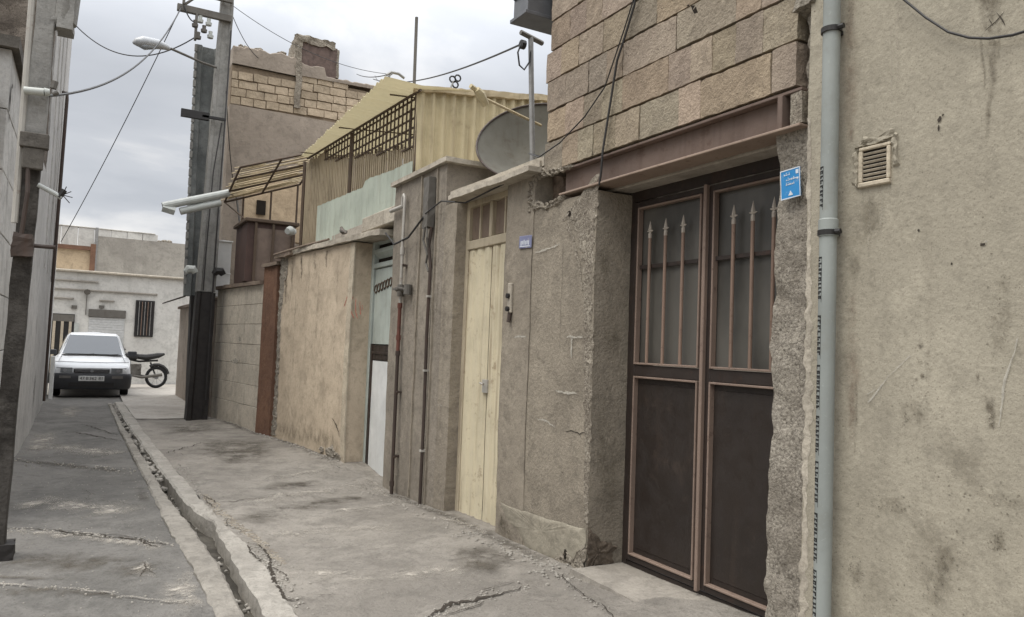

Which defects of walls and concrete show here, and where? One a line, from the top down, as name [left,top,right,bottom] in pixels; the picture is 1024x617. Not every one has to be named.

crack [204,497,339,600]
spalling [526,164,618,568]